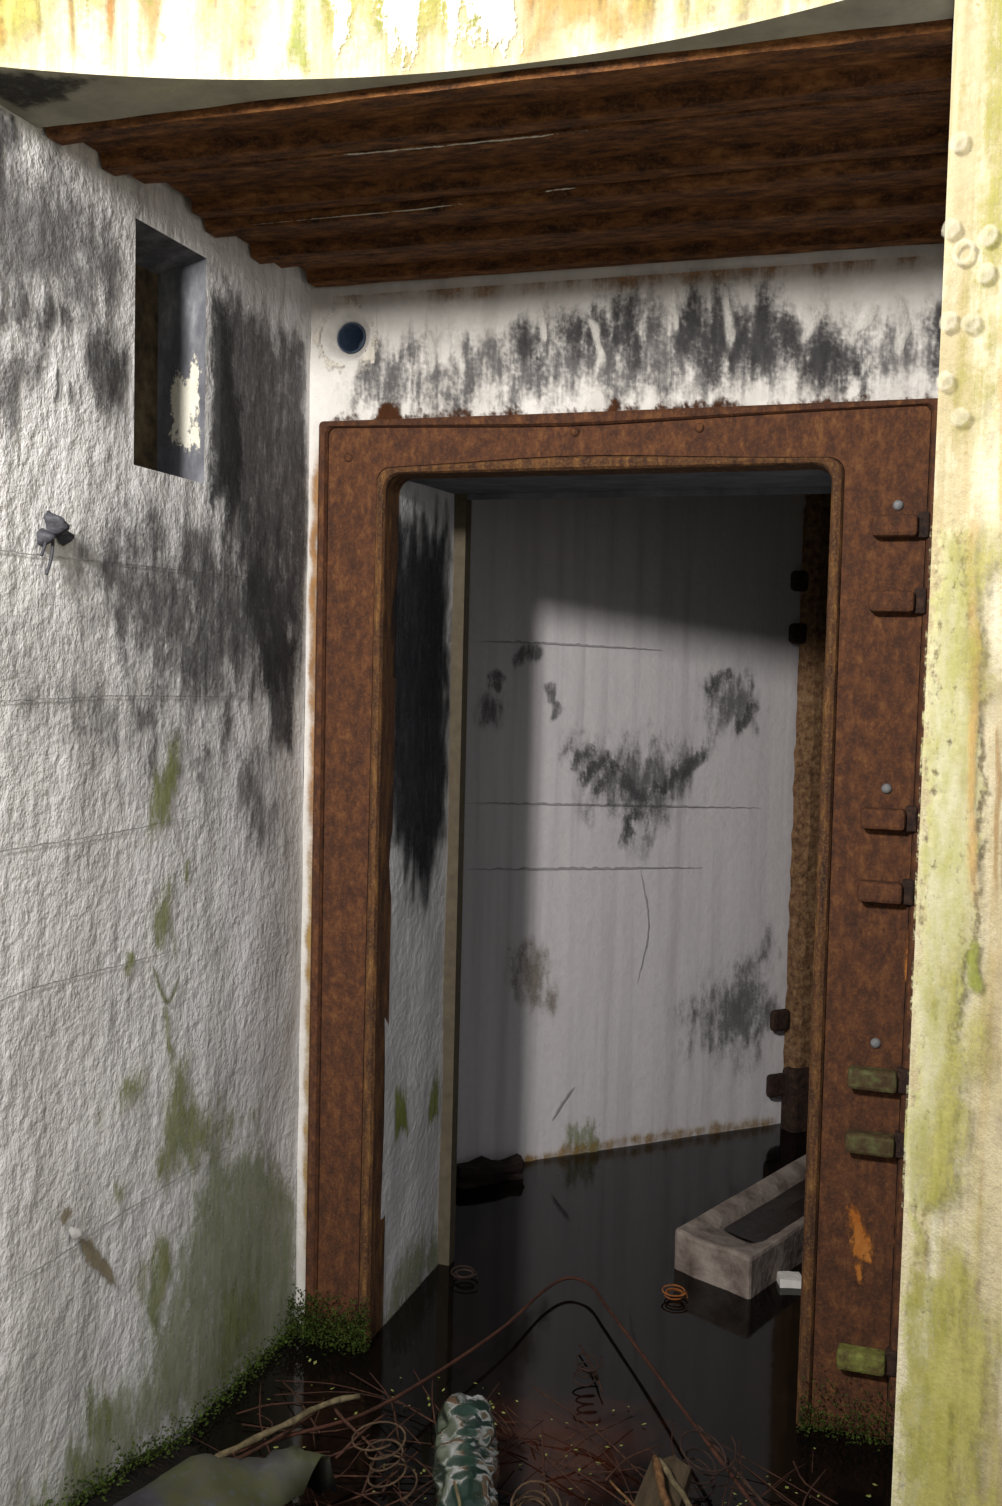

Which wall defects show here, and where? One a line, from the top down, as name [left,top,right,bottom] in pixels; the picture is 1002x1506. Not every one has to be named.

peeling [330,0,351,57]
peeling [378,0,523,71]
damp [333,134,553,156]
damp [588,319,605,363]
damp [720,287,734,345]
damp [895,300,909,356]
damp [55,369,72,404]
rust [333,402,471,421]
rust [567,396,739,412]
rust [308,467,318,830]
rust [303,865,312,1223]
rust [846,1205,873,1283]